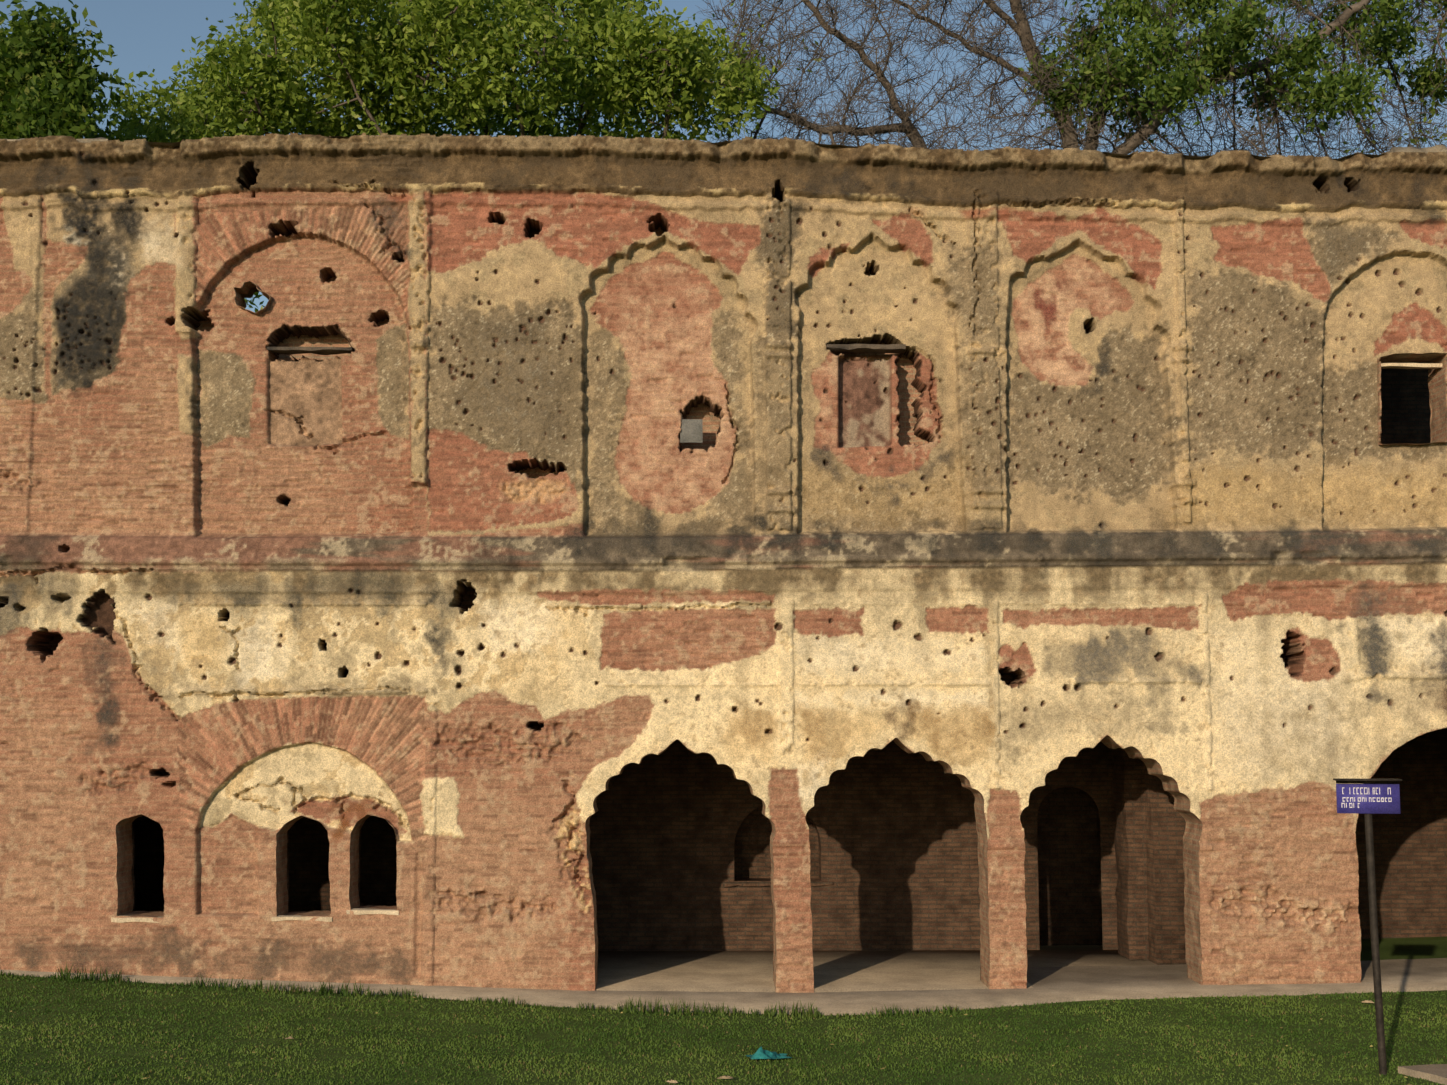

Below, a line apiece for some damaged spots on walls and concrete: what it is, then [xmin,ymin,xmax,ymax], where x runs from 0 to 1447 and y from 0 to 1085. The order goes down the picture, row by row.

damp [55,157,123,388]
peeling [0,192,178,403]
damp [114,199,138,237]
spalling [1210,216,1332,302]
spalling [424,184,762,513]
crack [263,407,390,455]
spalling [27,627,65,659]
spalling [50,589,117,644]
spalling [538,587,865,671]
spalling [926,603,1203,687]
spalling [1222,578,1447,681]
crack [233,775,411,827]